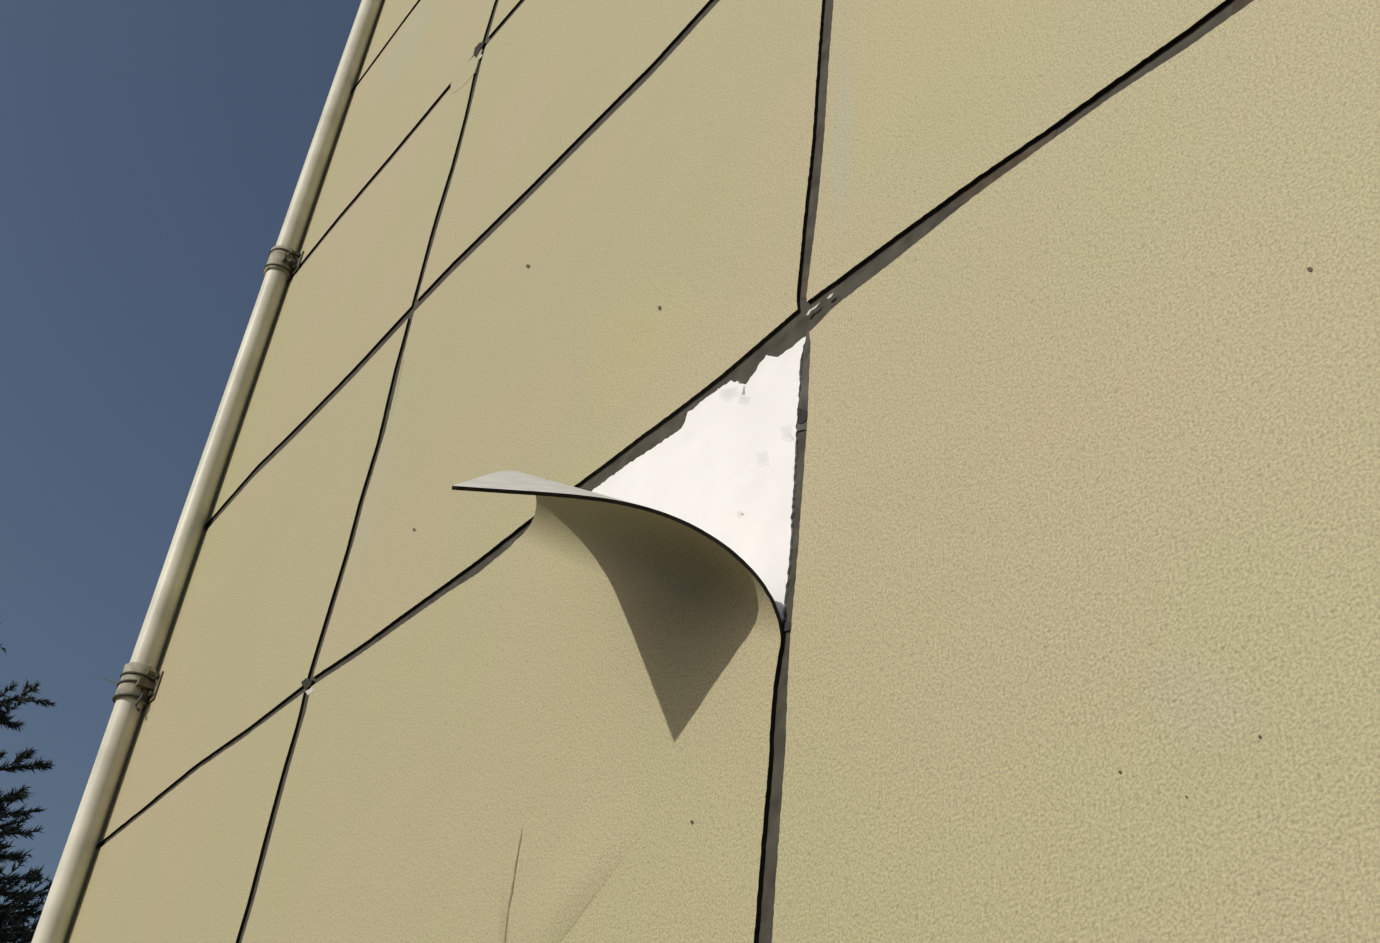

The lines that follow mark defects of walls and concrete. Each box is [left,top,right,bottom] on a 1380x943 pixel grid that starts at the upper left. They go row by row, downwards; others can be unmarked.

peeling [452,470,784,647]
crack [504,830,522,943]